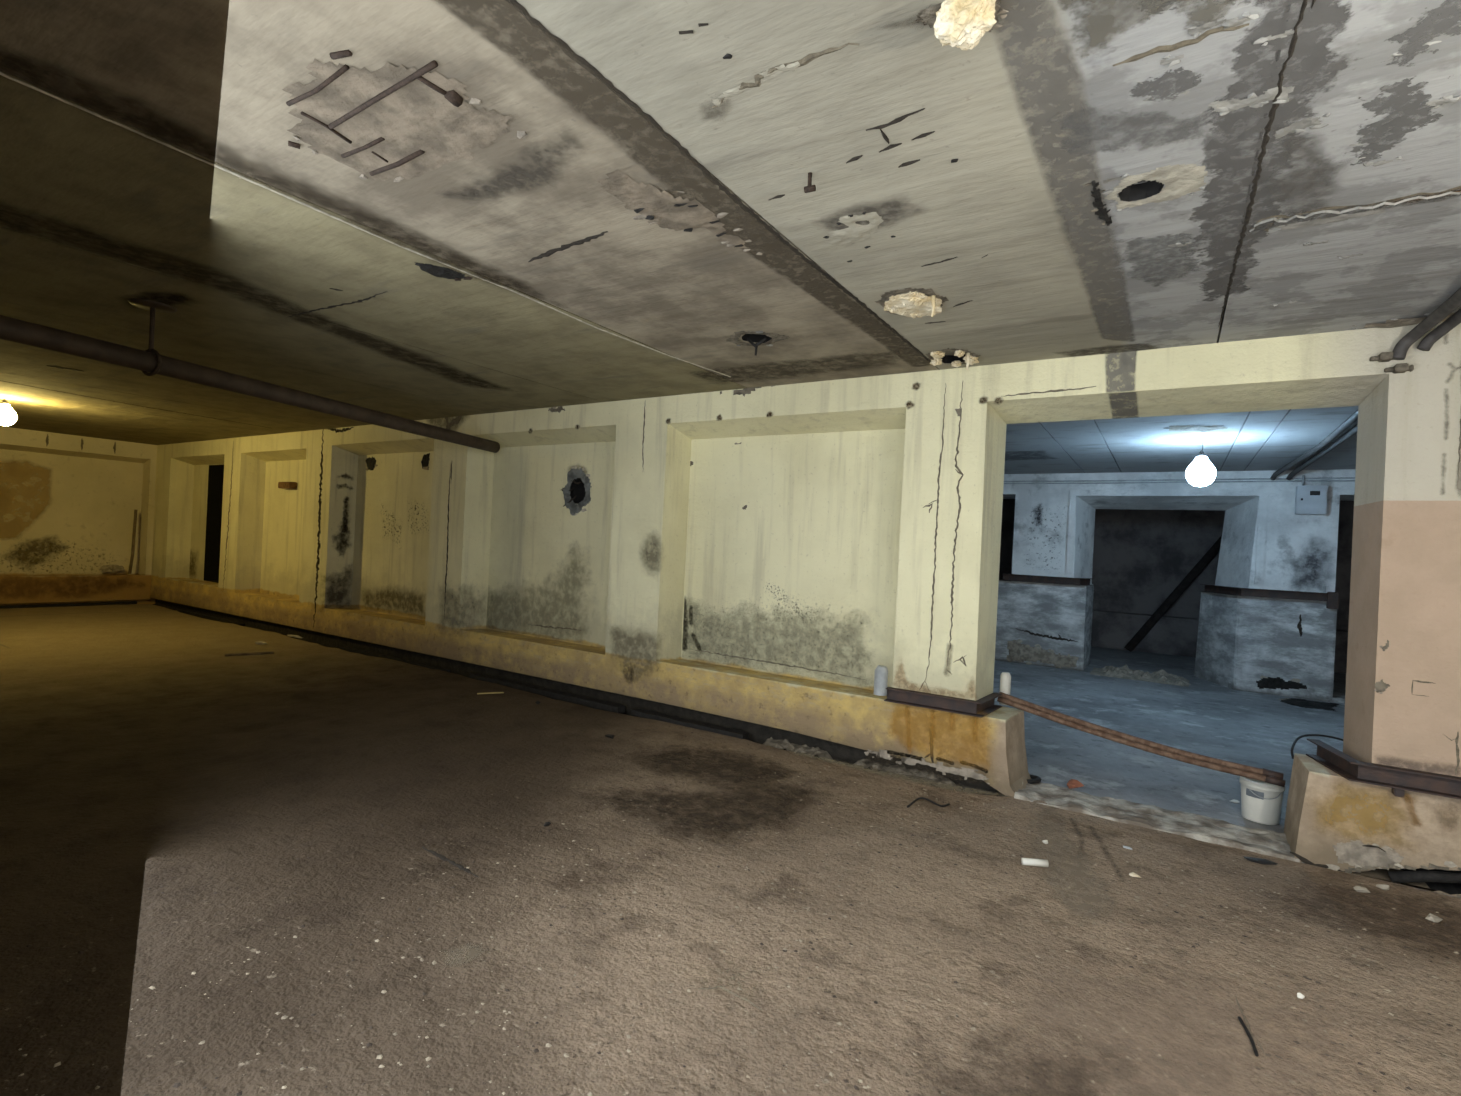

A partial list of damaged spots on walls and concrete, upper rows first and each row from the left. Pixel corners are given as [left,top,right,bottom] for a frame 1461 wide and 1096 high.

spalling [282,50,527,182]
peeling [1130,54,1201,101]
peeling [1349,0,1461,167]
crack [1218,0,1316,327]
spalling [822,207,896,262]
spalling [562,465,592,516]
damp [2,538,111,572]
crack [919,382,966,693]
damp [1294,543,1329,589]
damp [682,583,838,662]
damp [609,748,810,837]
spalling [1326,840,1461,899]